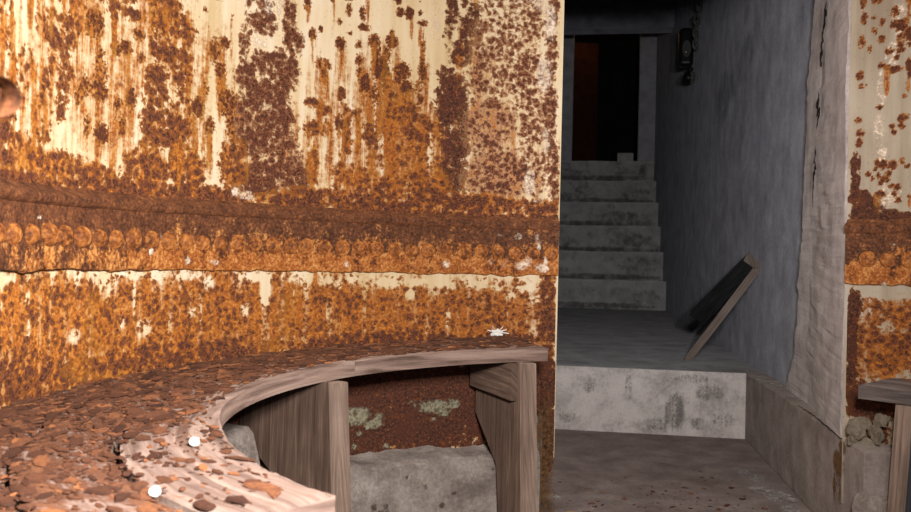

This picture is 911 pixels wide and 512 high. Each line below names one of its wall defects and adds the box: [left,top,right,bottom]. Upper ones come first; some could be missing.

corrosion [0,0,561,218]
corrosion [848,113,911,219]
corrosion [858,0,911,110]
corrosion [0,269,557,512]
corrosion [845,288,911,445]